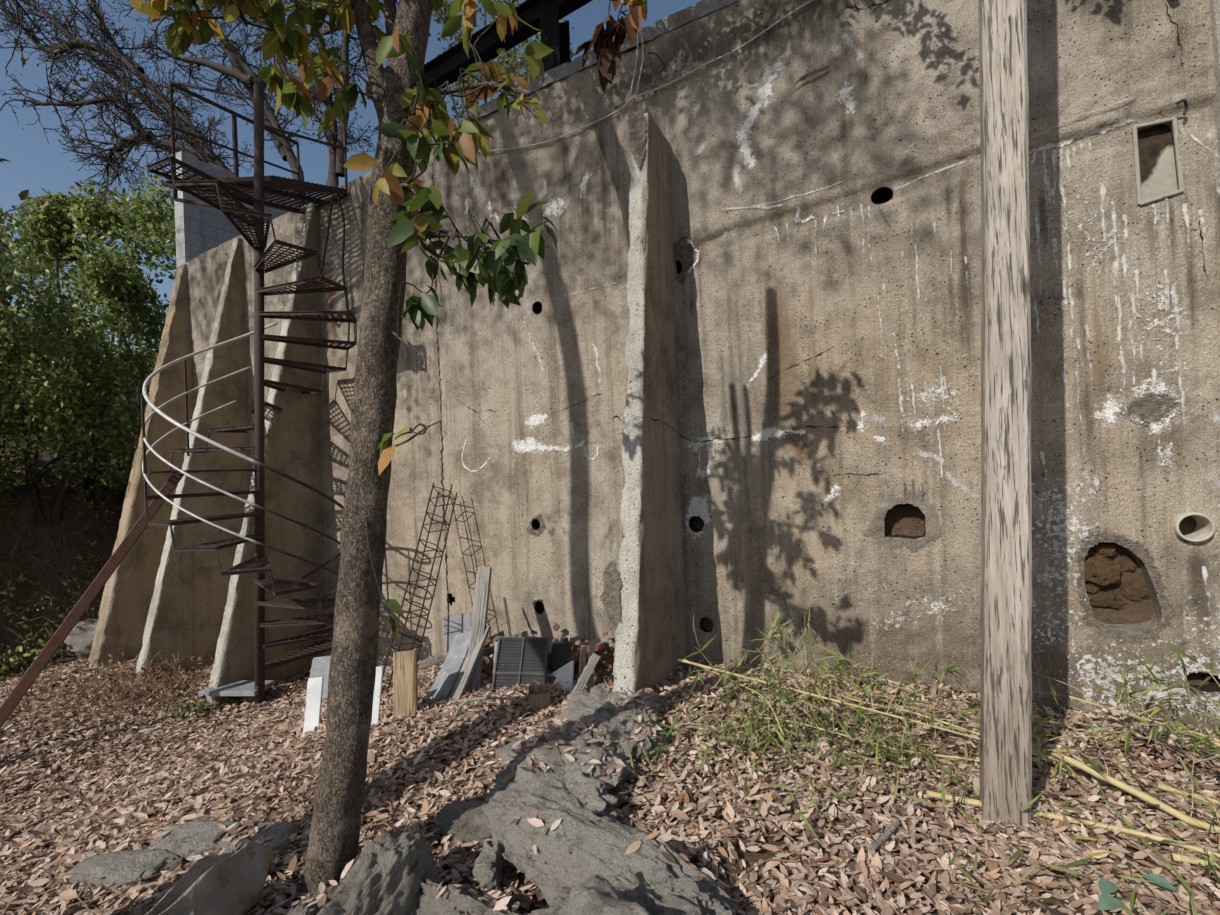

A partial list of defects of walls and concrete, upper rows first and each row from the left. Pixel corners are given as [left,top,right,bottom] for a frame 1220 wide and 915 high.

crack [554,390,843,443]
damp [1028,117,1220,467]
damp [1031,451,1220,731]
spalling [1077,533,1175,644]